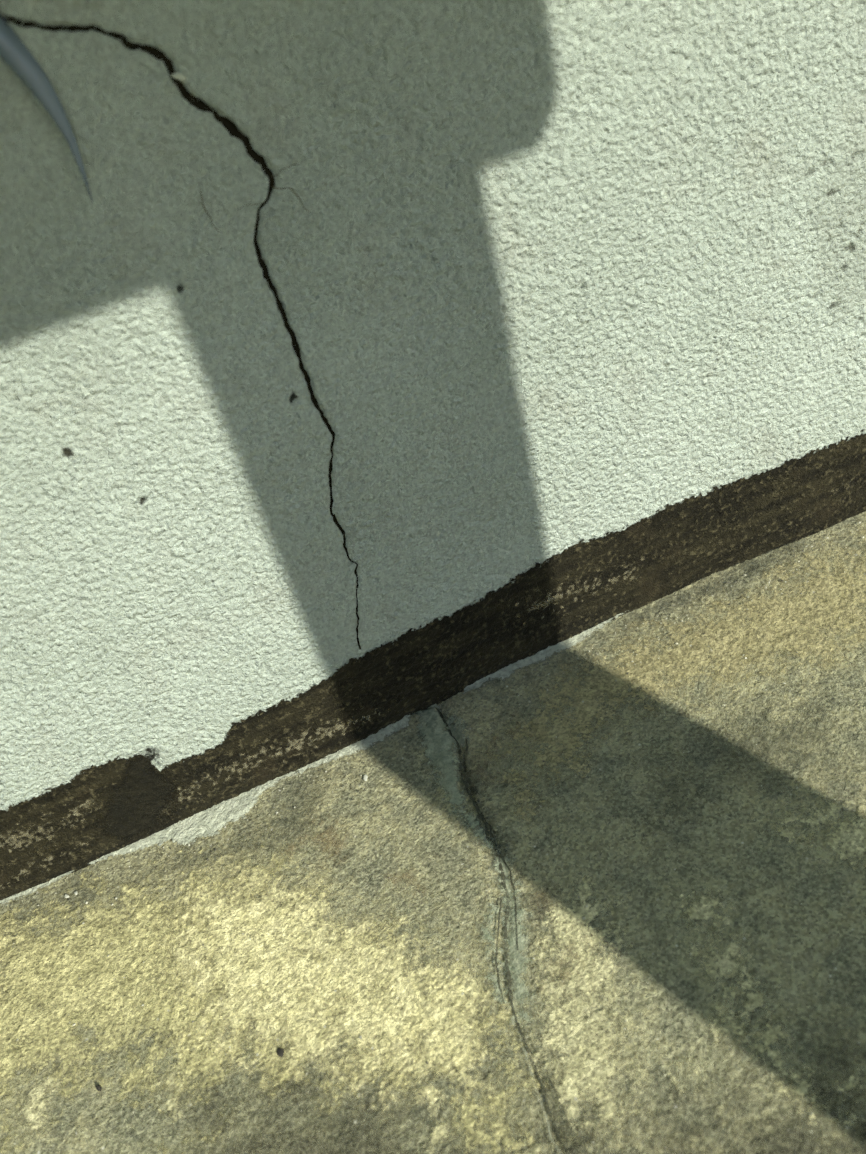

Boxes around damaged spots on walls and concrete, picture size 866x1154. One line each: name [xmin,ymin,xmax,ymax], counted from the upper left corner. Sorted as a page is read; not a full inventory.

crack [3,17,361,650]
crack [416,703,583,1153]